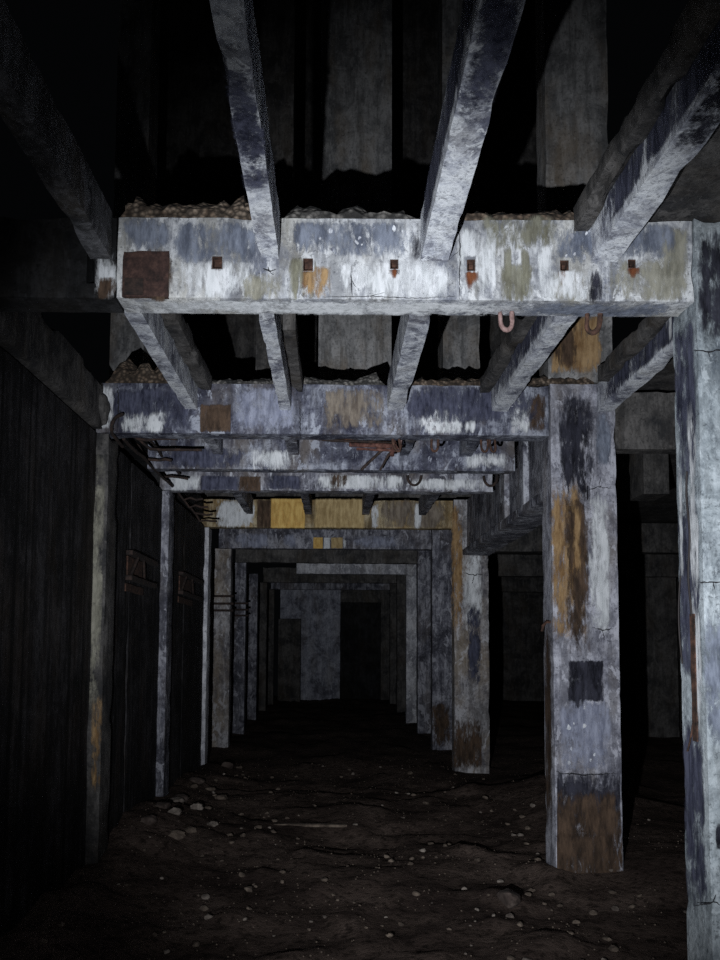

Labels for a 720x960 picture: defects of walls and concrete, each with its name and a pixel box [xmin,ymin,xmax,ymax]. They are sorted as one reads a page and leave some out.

rust [466,272,478,286]
rust [552,316,602,372]
rust [321,439,402,471]
water stain [559,396,610,631]
water stain [557,773,623,874]